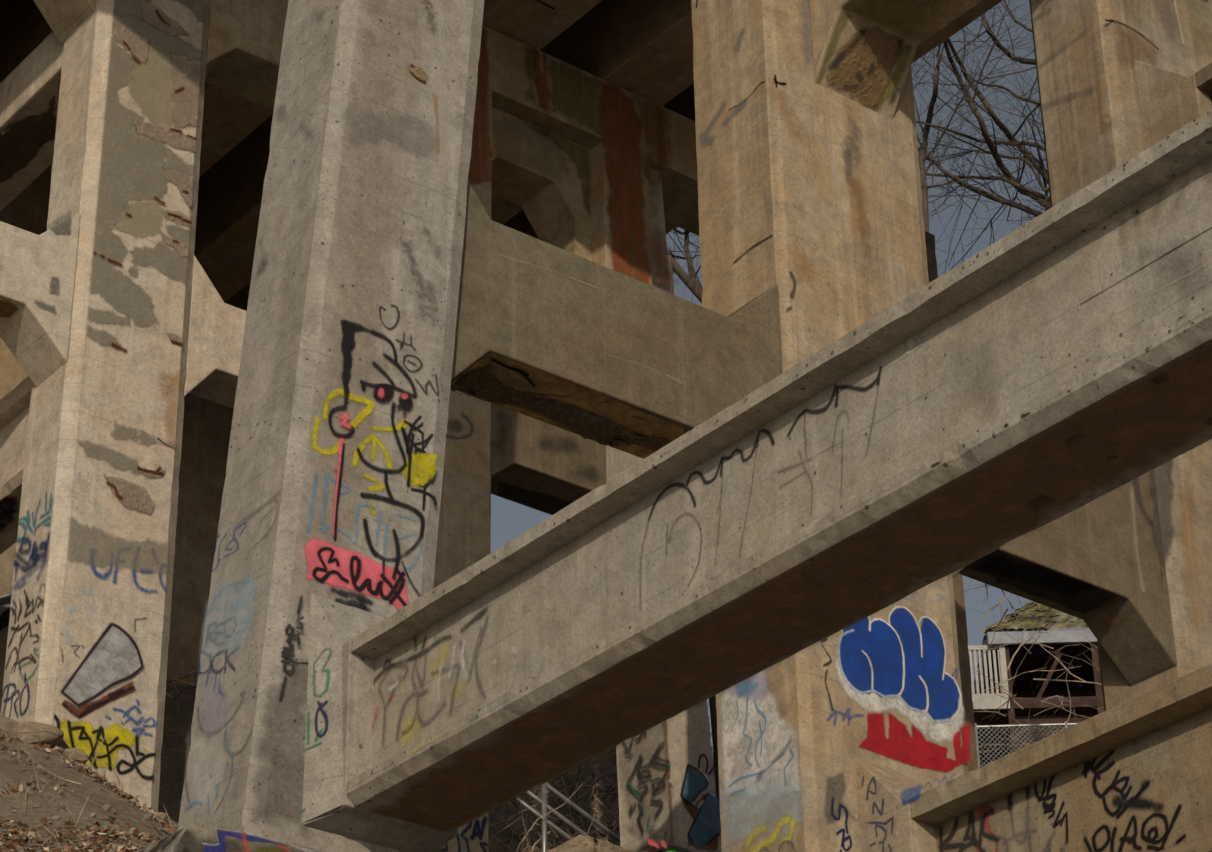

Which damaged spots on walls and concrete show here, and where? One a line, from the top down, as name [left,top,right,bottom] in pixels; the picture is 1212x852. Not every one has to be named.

peeling [87,0,205,352]
rust [468,28,492,184]
rust [601,83,671,284]
spalling [828,27,903,109]
peeling [69,518,168,573]
spalling [79,426,175,514]
spalling [450,352,684,458]
leakage [375,345,1212,832]